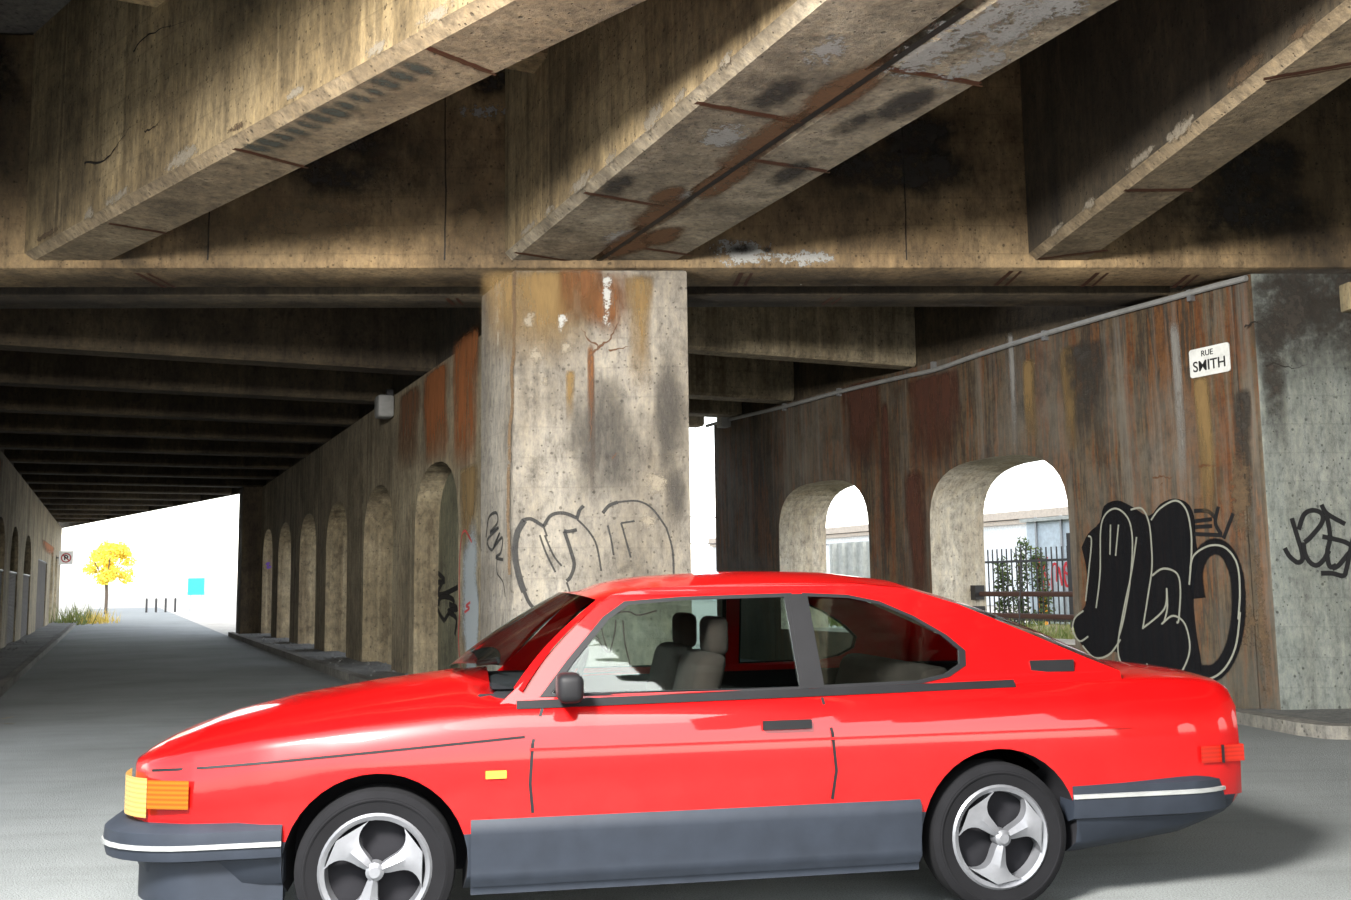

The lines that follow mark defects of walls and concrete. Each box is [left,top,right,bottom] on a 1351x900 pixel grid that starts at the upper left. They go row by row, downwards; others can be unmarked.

water stain [603,176,632,192]
water stain [700,124,749,148]
corrosion [488,64,983,355]
water stain [753,80,798,108]
water stain [772,162,809,183]
water stain [802,36,849,66]
water stain [825,0,1090,193]
water stain [1173,139,1313,238]
corrosion [567,348,626,484]
crack [582,316,628,459]